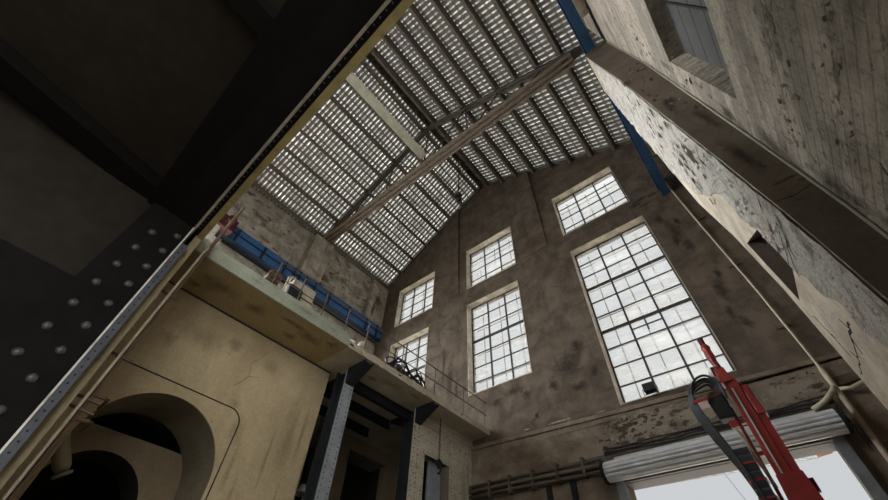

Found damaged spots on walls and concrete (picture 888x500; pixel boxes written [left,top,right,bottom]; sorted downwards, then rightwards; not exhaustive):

crack [775,184,811,276]
crack [813,316,863,374]
peeling [759,372,829,408]
peeling [599,399,717,448]